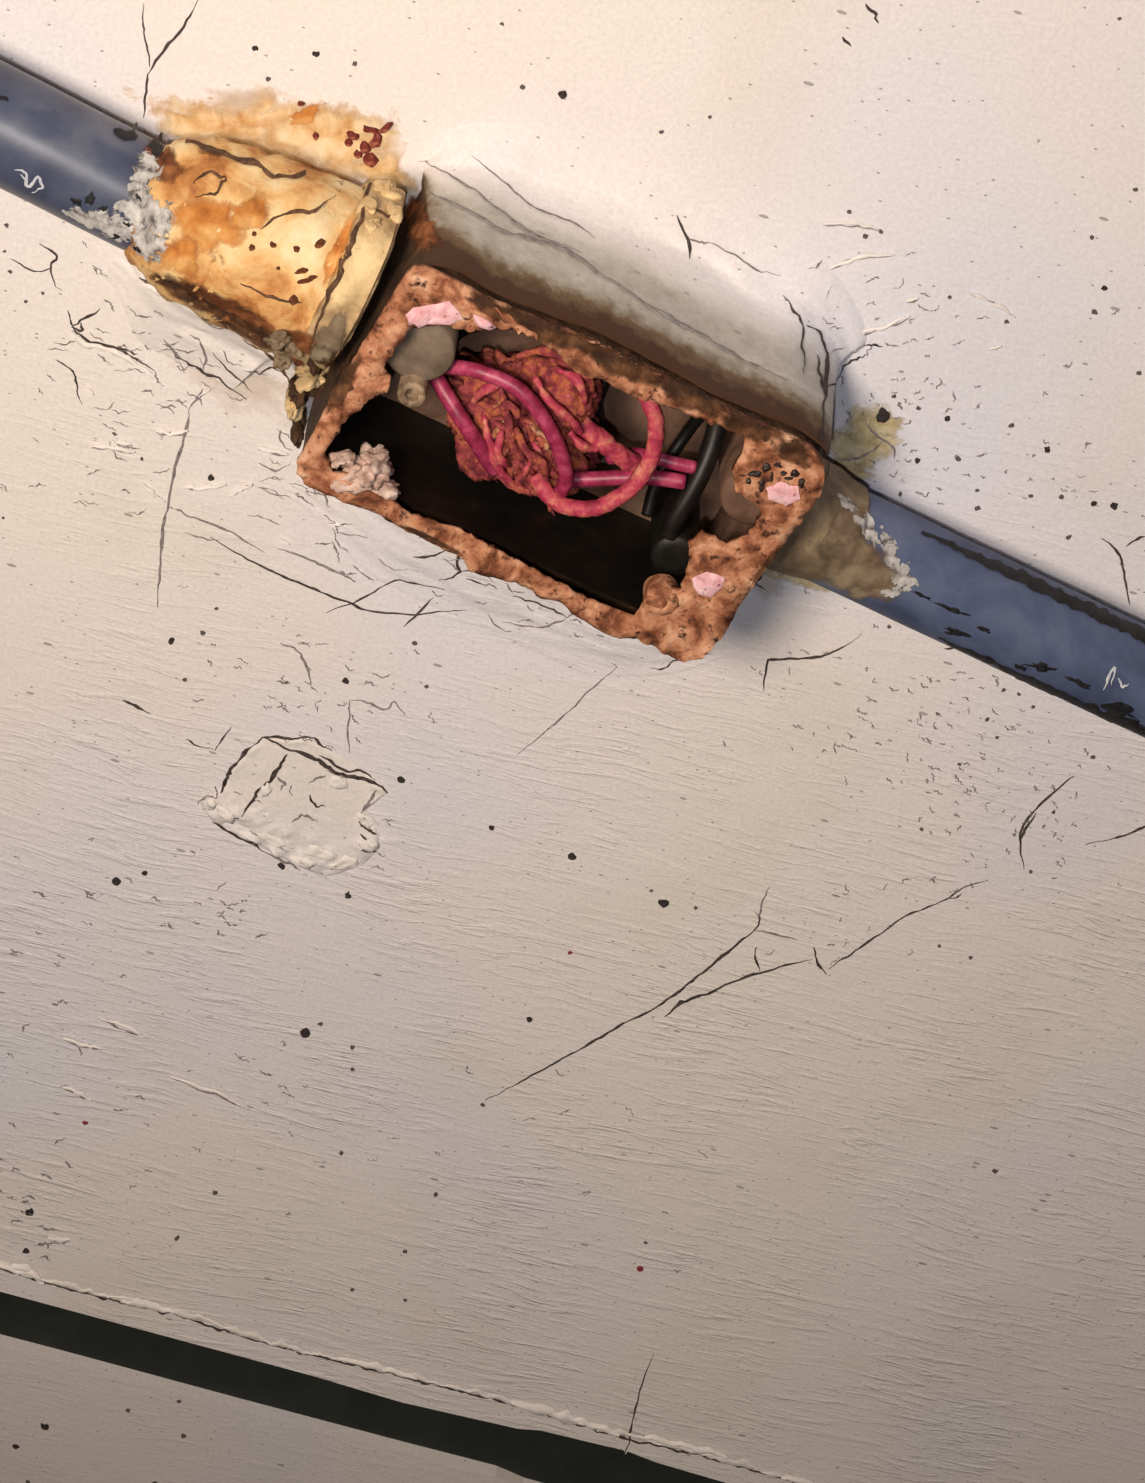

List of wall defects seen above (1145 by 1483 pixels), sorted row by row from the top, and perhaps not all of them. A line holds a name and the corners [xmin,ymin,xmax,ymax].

crack [142,0,198,117]
rust [161,89,441,249]
crack [11,243,573,628]
crack [1019,776,1074,867]
crack [1085,826,1145,845]
crack [486,880,988,1100]
crack [625,1356,653,1452]